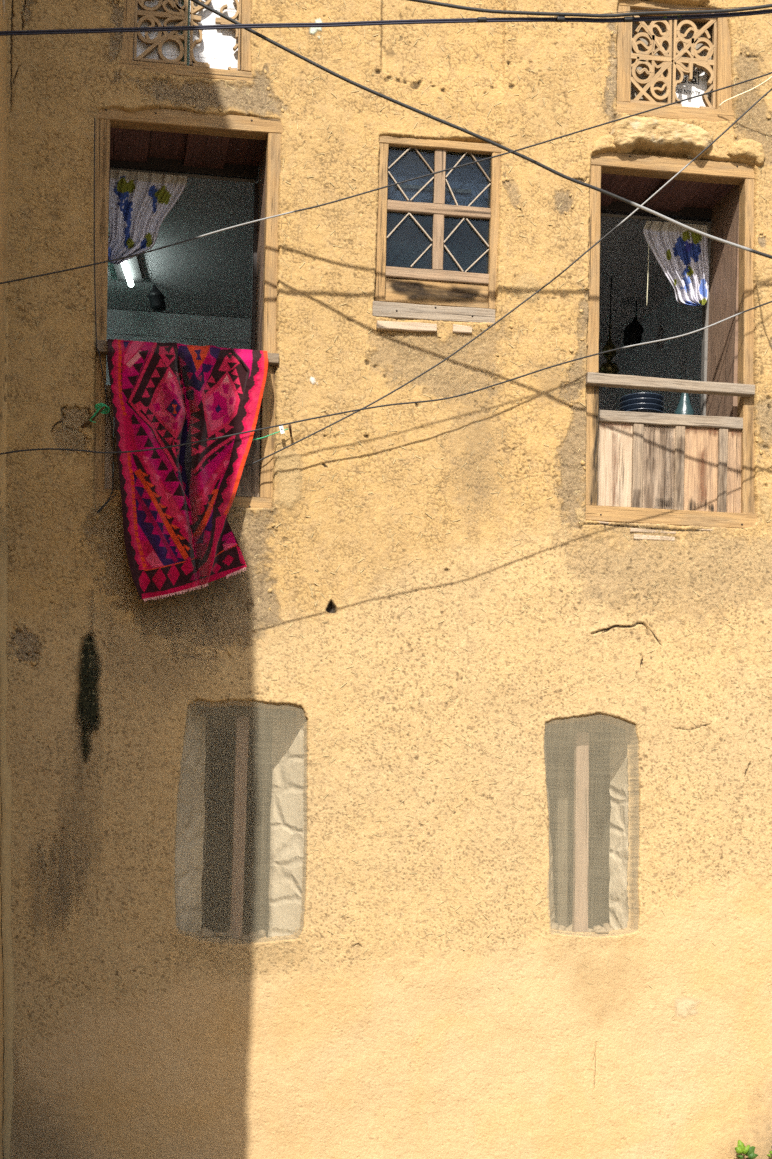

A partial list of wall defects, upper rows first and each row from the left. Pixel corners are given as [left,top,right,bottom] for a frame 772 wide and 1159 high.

leakage [77,634,100,761]
crack [593,623,660,666]